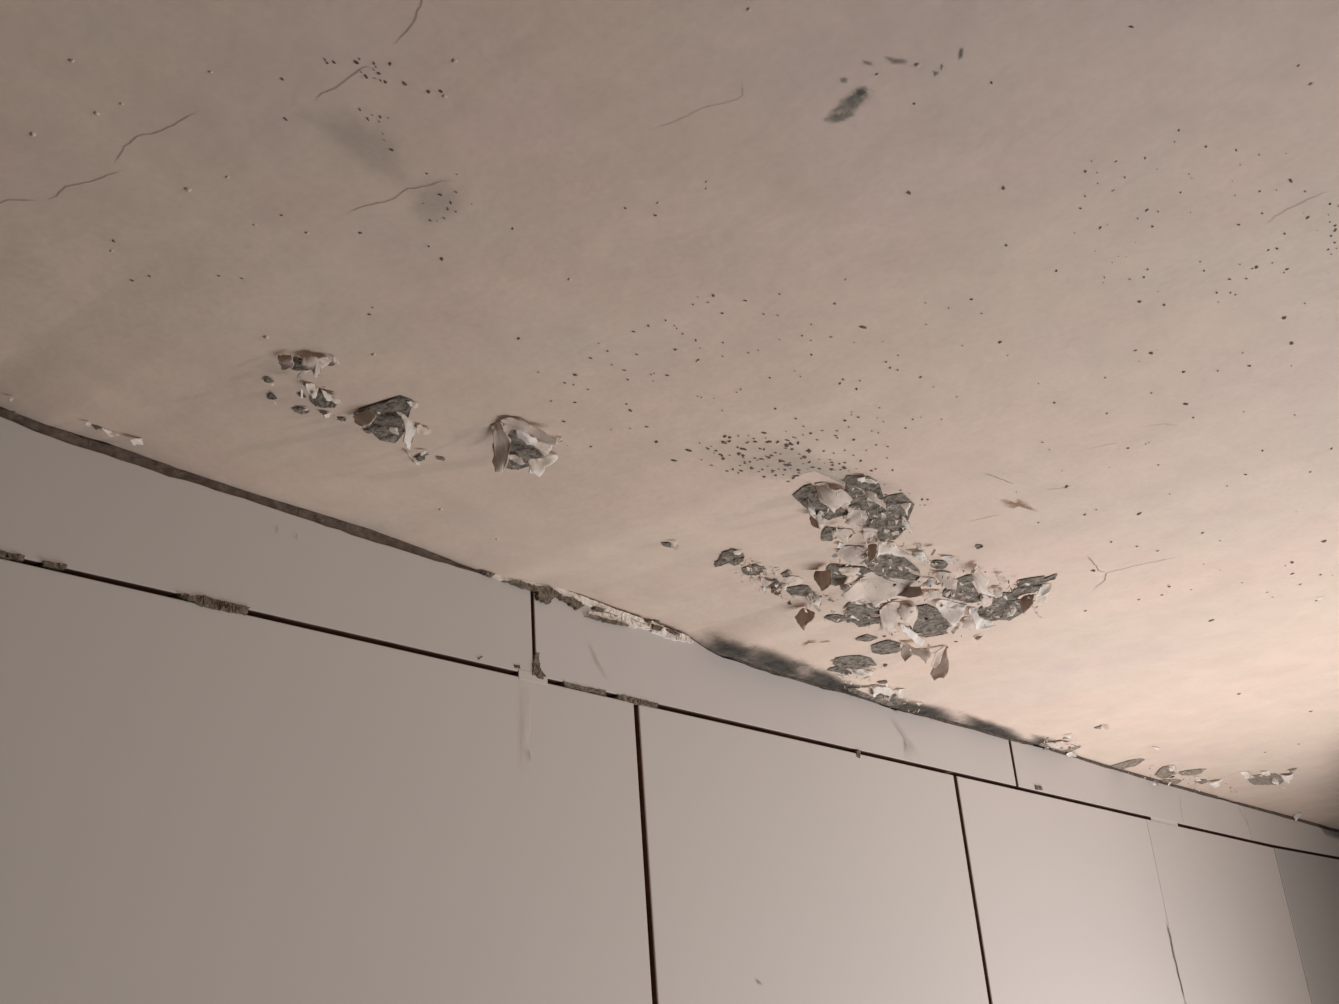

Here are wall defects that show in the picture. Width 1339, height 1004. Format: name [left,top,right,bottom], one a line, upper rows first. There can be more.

damp [830,79,865,122]
peeling [264,355,445,465]
peeling [715,476,1058,721]
flaking render [1037,734,1081,757]
flaking render [1112,746,1297,793]